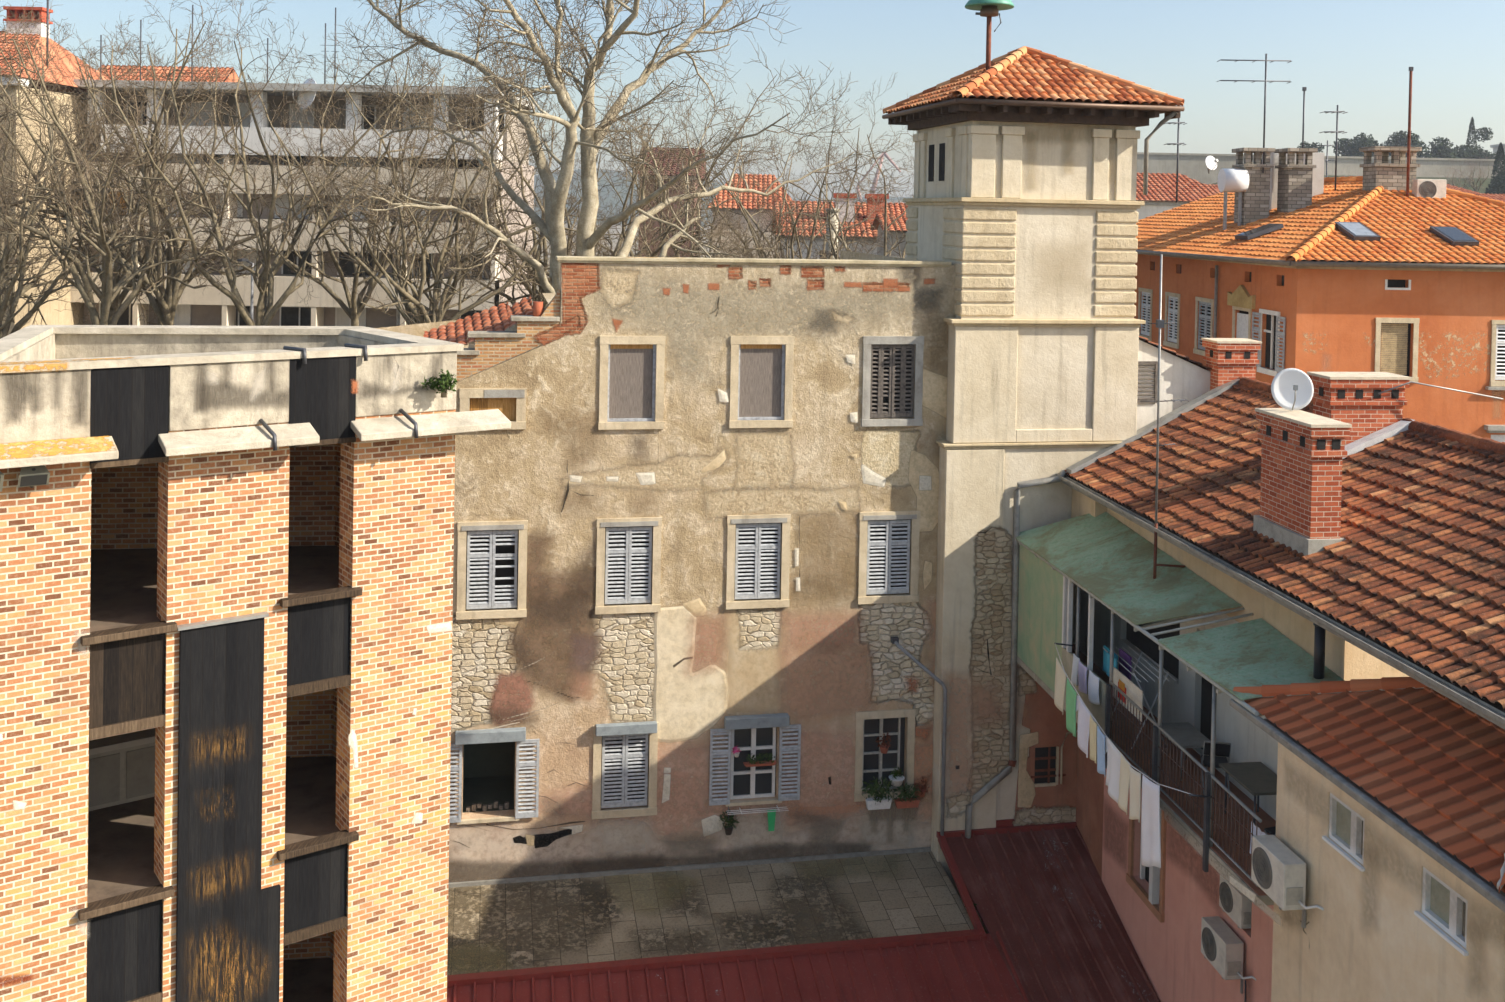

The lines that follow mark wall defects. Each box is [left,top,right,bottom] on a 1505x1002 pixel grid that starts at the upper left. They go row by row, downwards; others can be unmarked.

flaking render [534,263,600,345]
flaking render [708,265,935,292]
spalling [427,615,532,733]
leakage [515,536,597,696]
spalling [580,609,655,723]
peeling [683,598,707,617]
peeling [725,608,782,712]
spalling [857,560,935,727]
spalling [968,527,1076,826]
peeling [349,729,358,768]
spalling [513,825,583,848]
peeling [662,767,671,803]